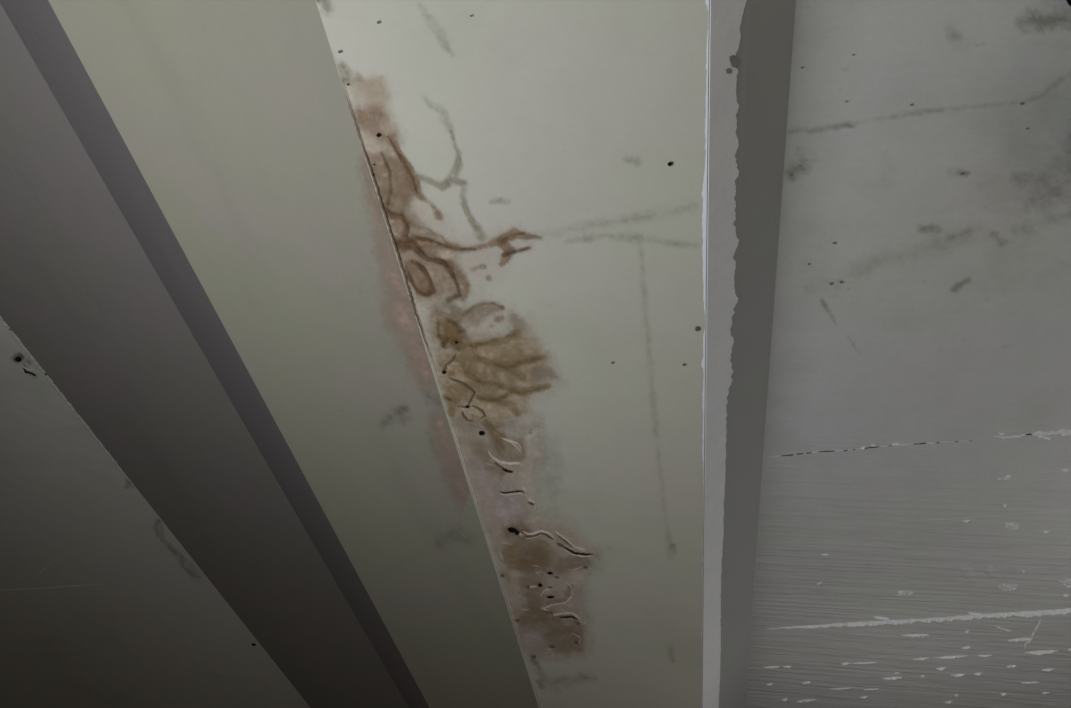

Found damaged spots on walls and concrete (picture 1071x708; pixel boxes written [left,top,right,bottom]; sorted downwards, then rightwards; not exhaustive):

leakage [433,302,554,439]
peeling [454,422,596,659]